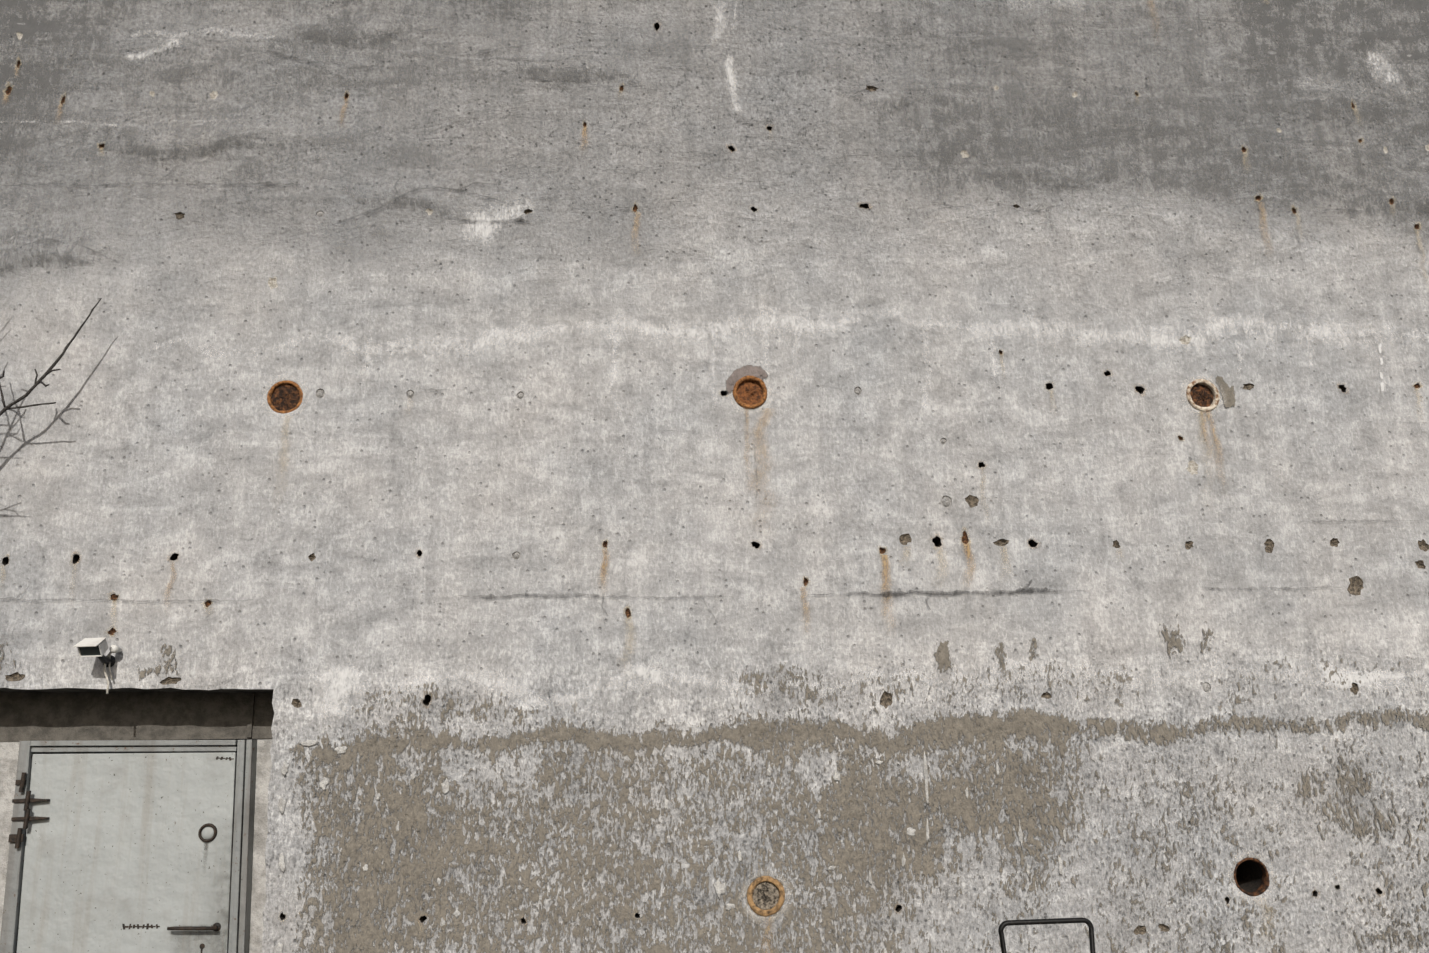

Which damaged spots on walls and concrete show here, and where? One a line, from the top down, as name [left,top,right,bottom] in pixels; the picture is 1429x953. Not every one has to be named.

corrosion [879,547,889,589]
corrosion [962,528,972,570]